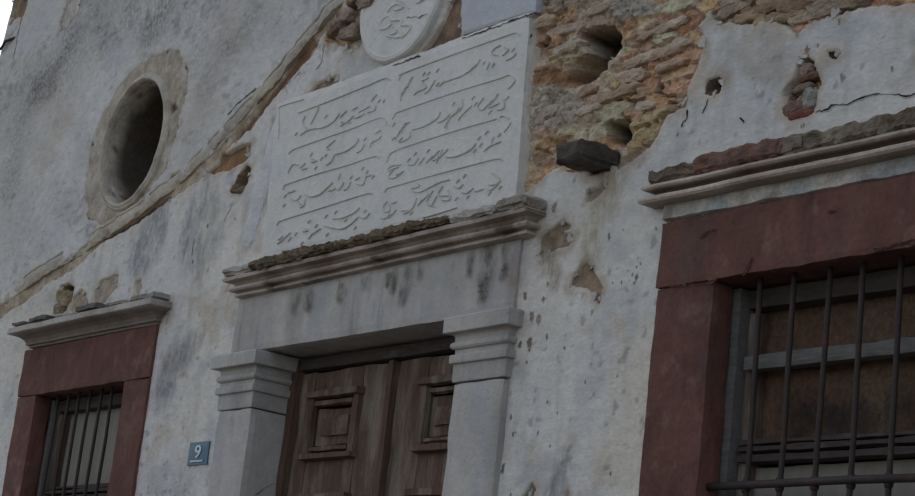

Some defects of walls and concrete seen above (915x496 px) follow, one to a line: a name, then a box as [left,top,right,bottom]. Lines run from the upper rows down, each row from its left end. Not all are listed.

spalling [524,0,915,202]
crack [816,92,915,113]
spalling [0,0,374,318]
peeling [535,201,575,259]
peeling [569,257,641,316]